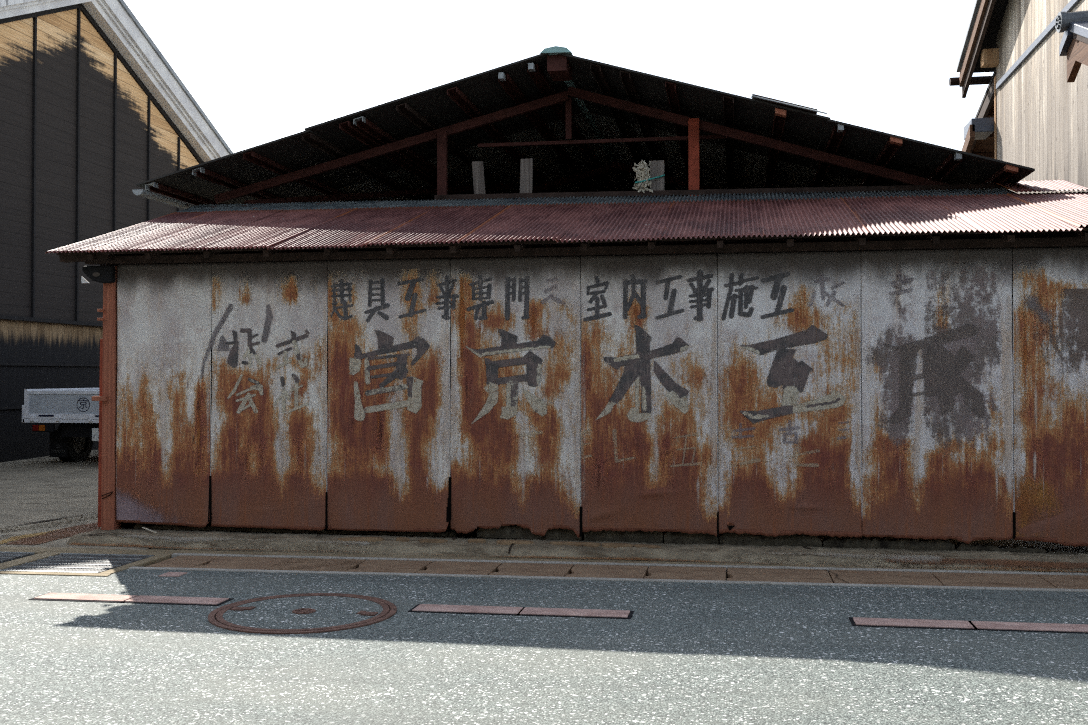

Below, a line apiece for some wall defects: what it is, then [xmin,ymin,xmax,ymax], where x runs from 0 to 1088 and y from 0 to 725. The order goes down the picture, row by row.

corrosion [116,268,1088,543]